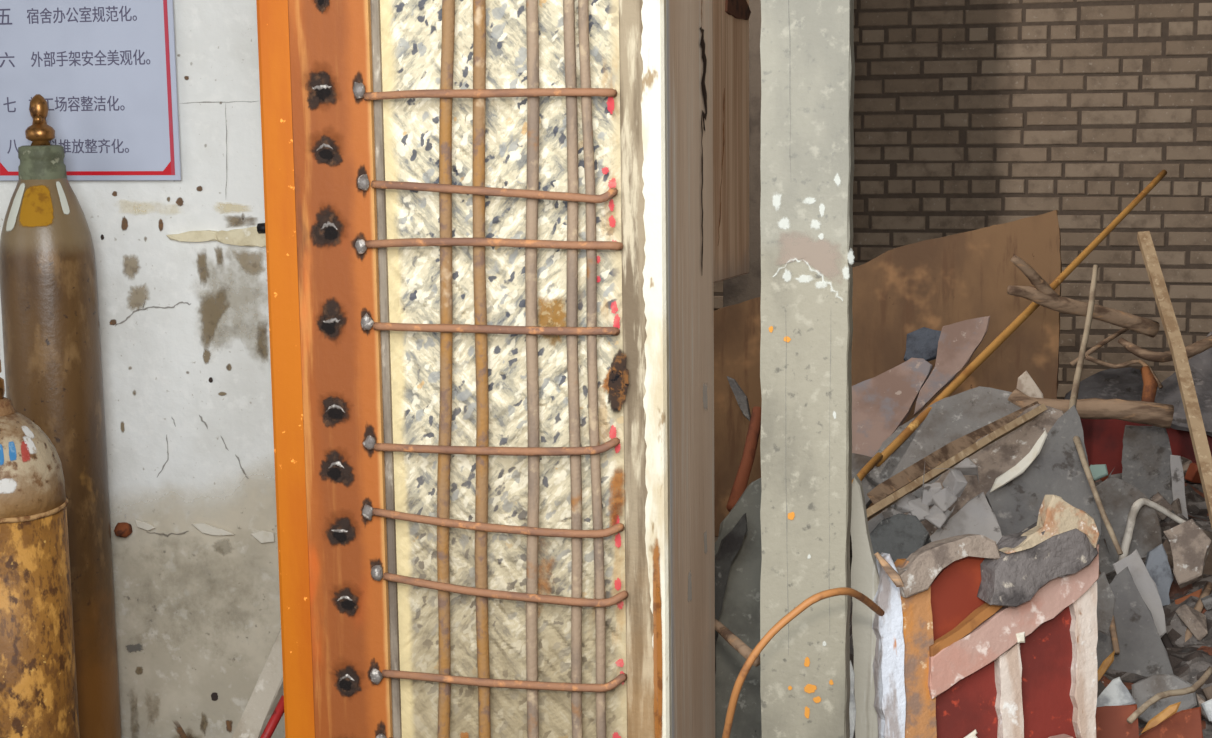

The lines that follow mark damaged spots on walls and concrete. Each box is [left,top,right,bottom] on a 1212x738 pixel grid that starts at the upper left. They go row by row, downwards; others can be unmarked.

crack [700,5,725,269]
rust [602,349,629,412]